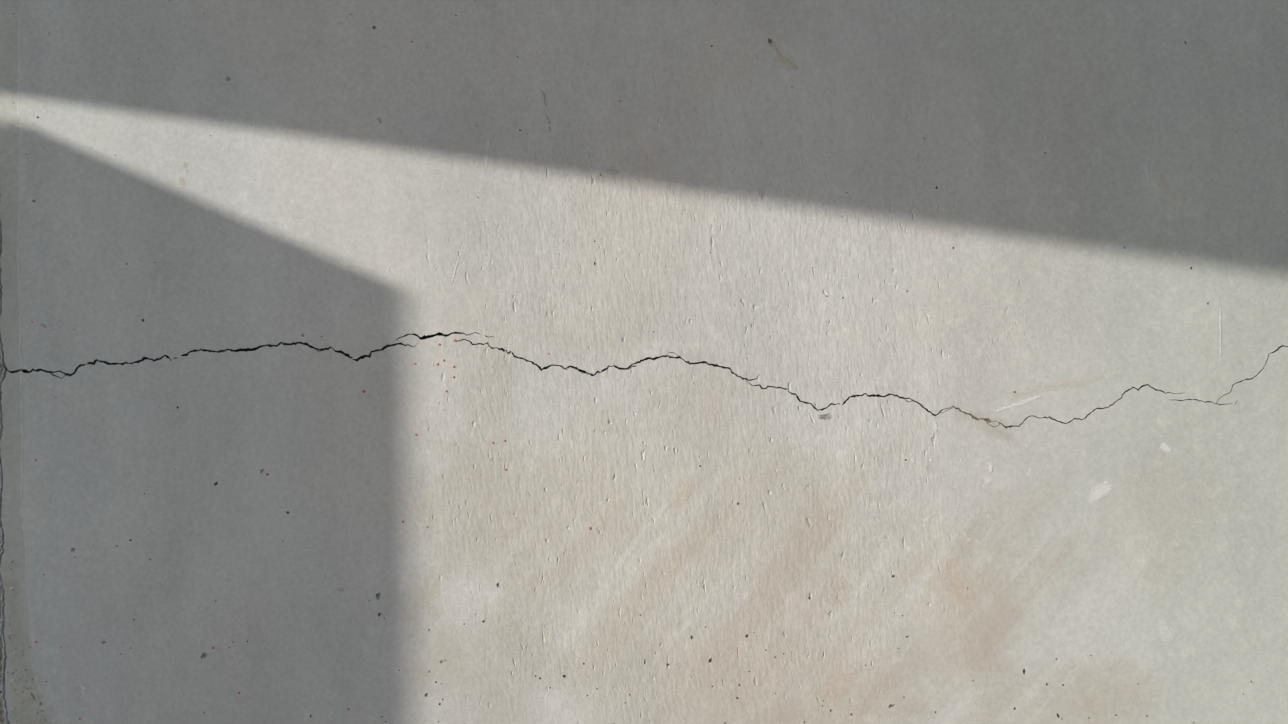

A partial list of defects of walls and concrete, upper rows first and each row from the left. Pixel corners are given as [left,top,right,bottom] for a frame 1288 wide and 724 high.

crack [2,332,1288,429]